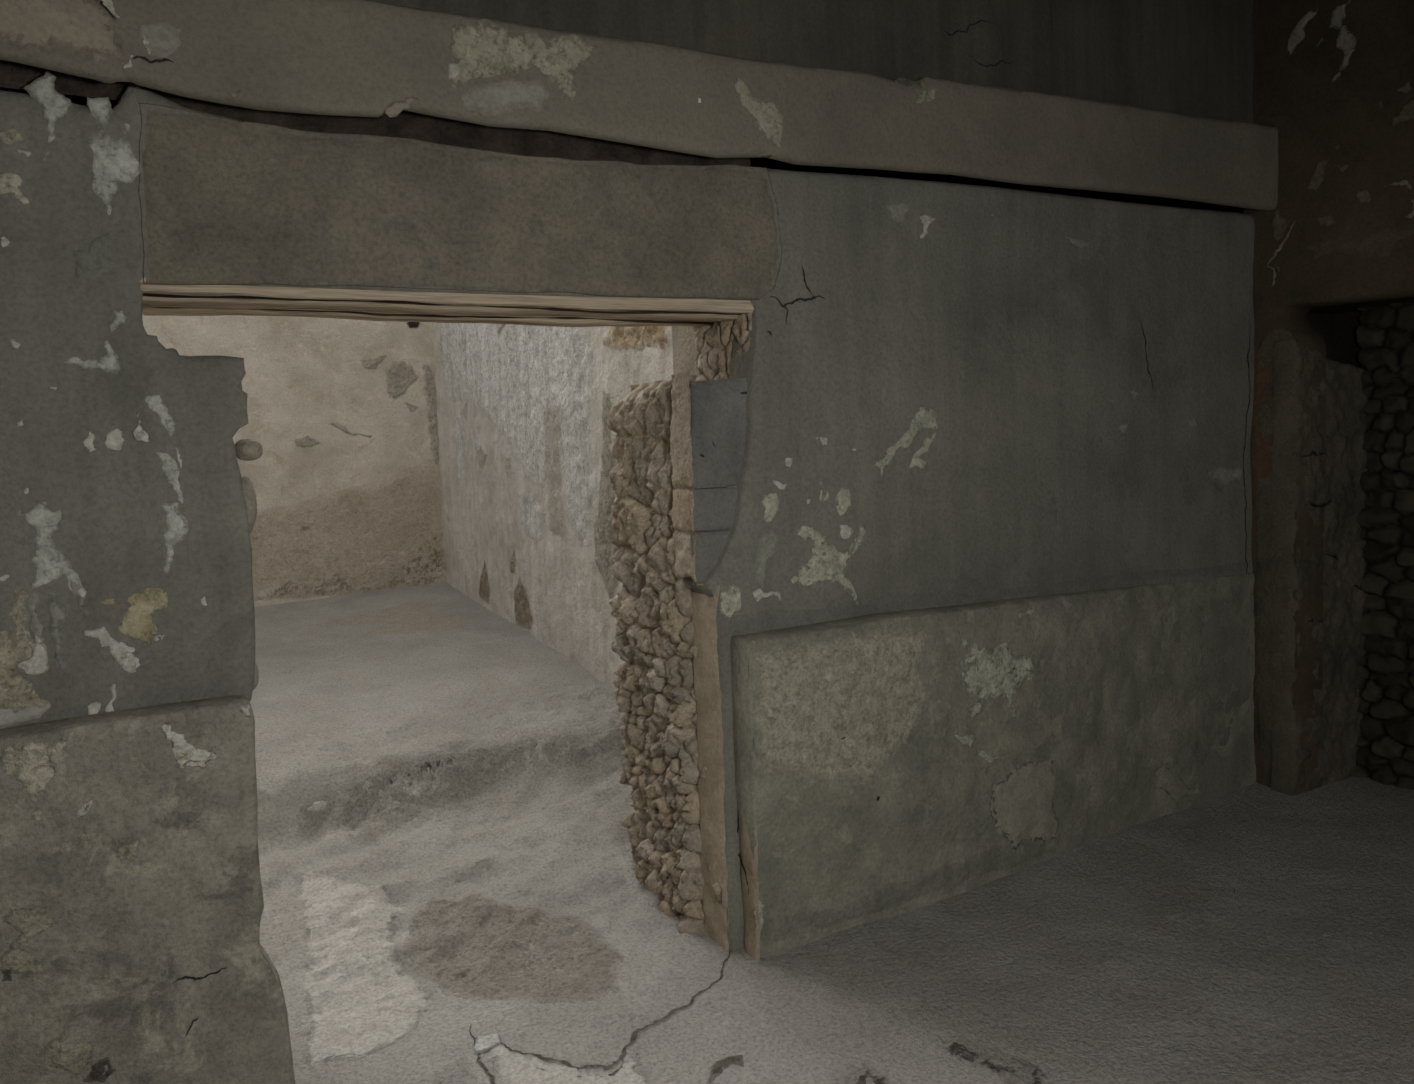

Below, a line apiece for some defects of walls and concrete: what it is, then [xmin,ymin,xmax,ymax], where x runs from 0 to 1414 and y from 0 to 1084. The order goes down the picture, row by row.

flaking render [0,172,29,204]
crack [771,266,824,323]
flaking render [83,395,176,452]
flaking render [874,406,938,476]
flaking render [791,480,867,606]
flaking render [0,574,71,830]
flaking render [82,588,169,715]
flaking render [749,623,930,787]
flaking render [955,638,1034,763]
flaking render [989,758,1059,854]
crack [469,951,732,1084]